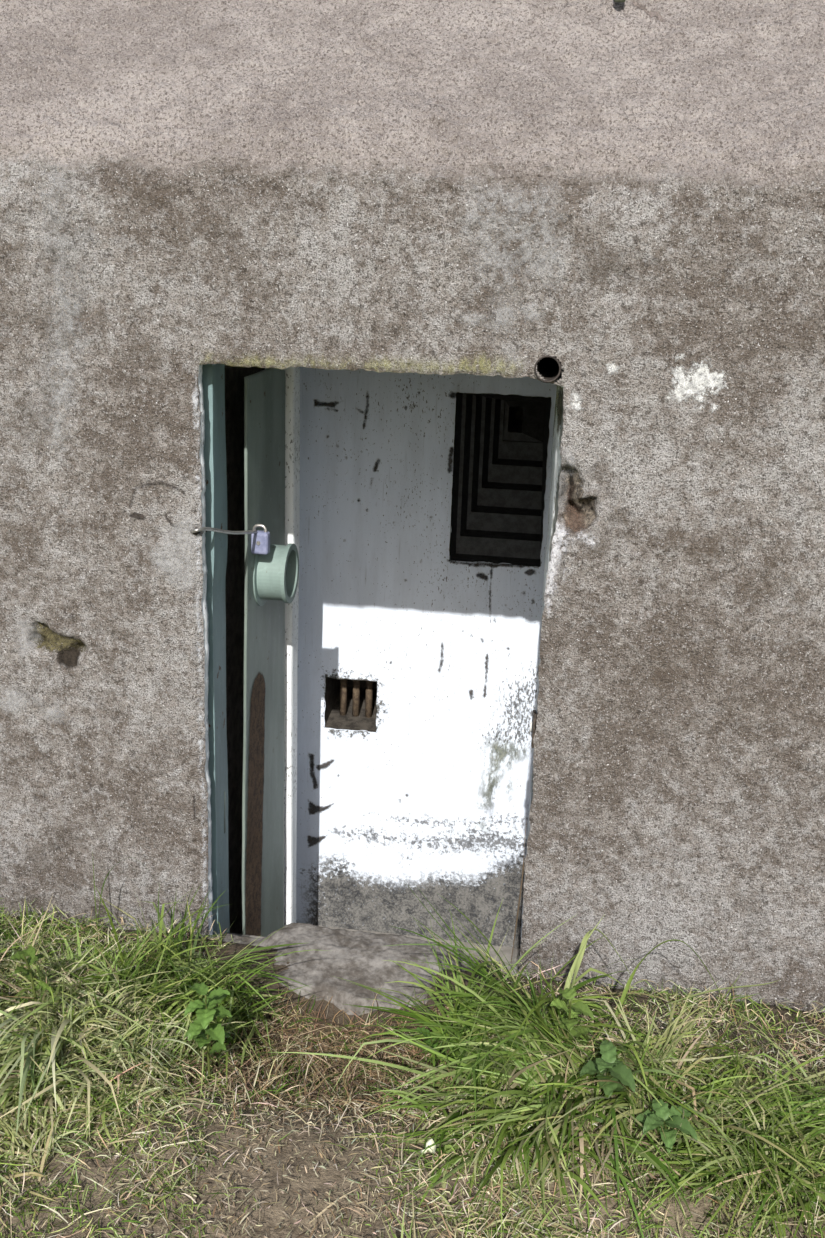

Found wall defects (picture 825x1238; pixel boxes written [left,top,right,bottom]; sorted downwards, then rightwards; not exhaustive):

spalling [31,622,86,668]
damp [484,742,518,806]
damp [306,855,525,949]